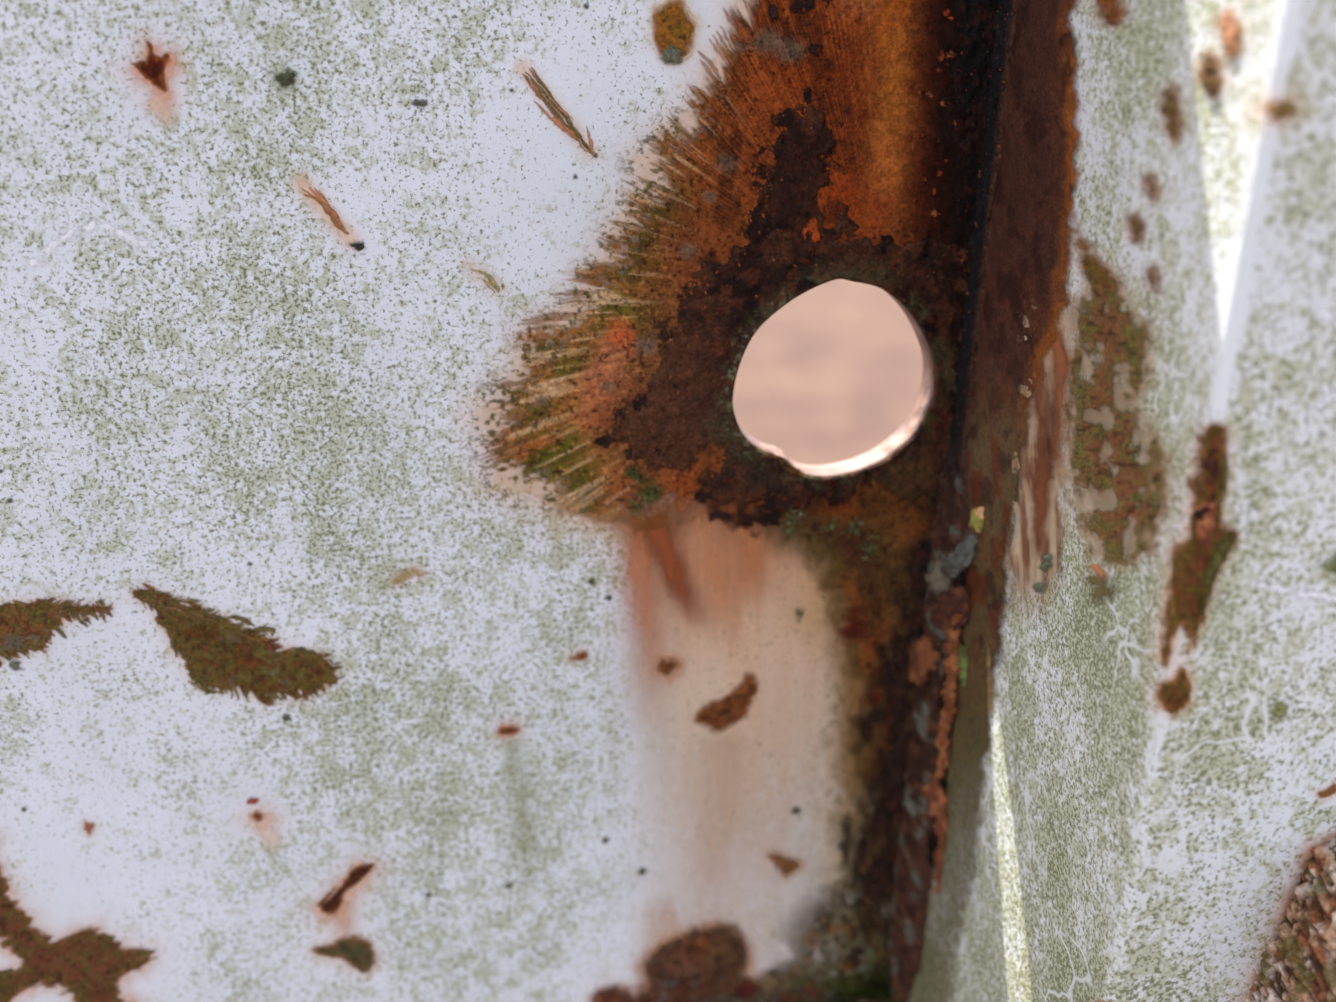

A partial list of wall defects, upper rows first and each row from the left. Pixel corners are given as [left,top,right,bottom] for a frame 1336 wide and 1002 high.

rust [133,41,175,114]
rust [1161,88,1181,138]
rust [1199,10,1240,96]
rust [302,187,349,234]
rust [471,0,1167,996]
rust [1157,423,1238,714]